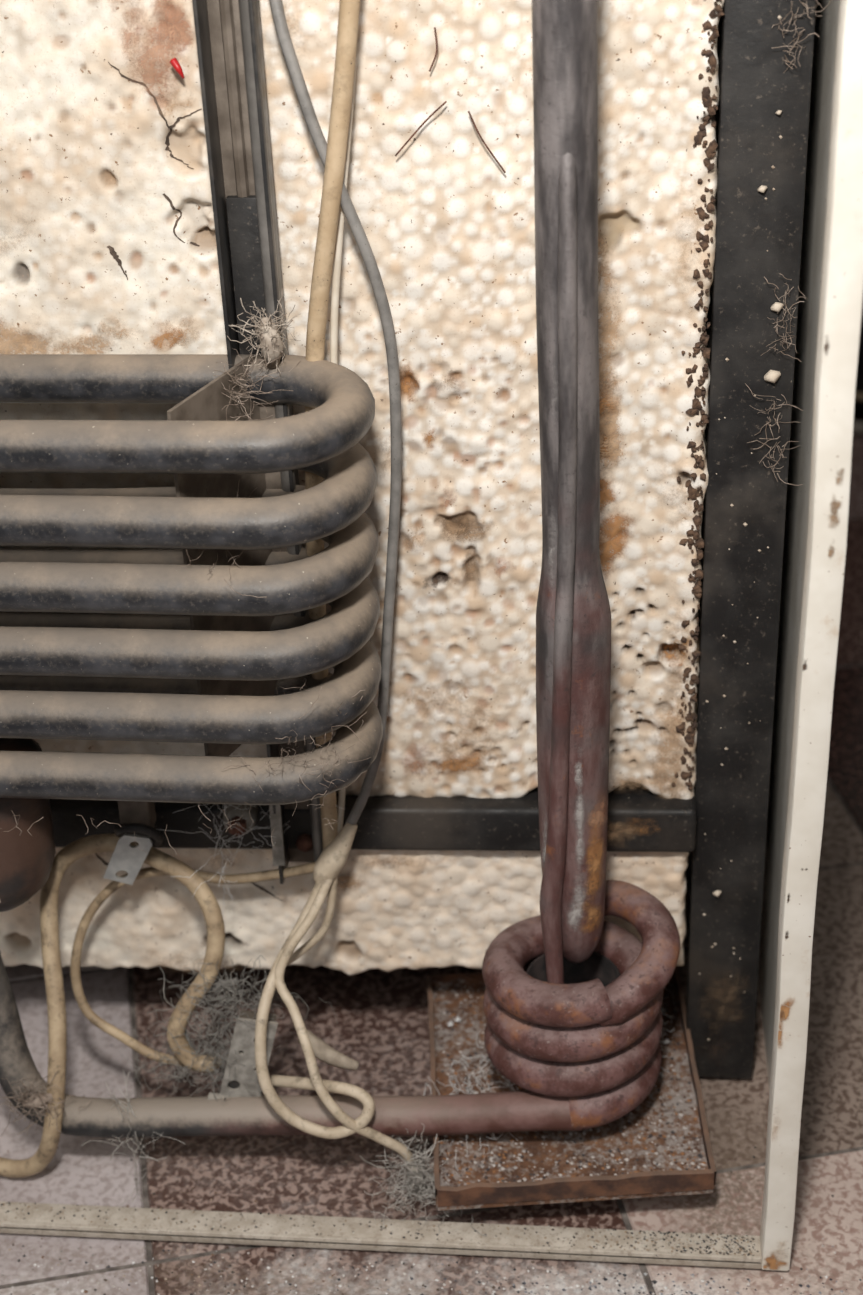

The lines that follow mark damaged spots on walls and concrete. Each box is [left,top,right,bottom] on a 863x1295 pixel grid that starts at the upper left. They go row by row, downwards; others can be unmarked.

rust [140,0,192,111]
rust [598,307,629,571]
rust [763,1251,787,1270]